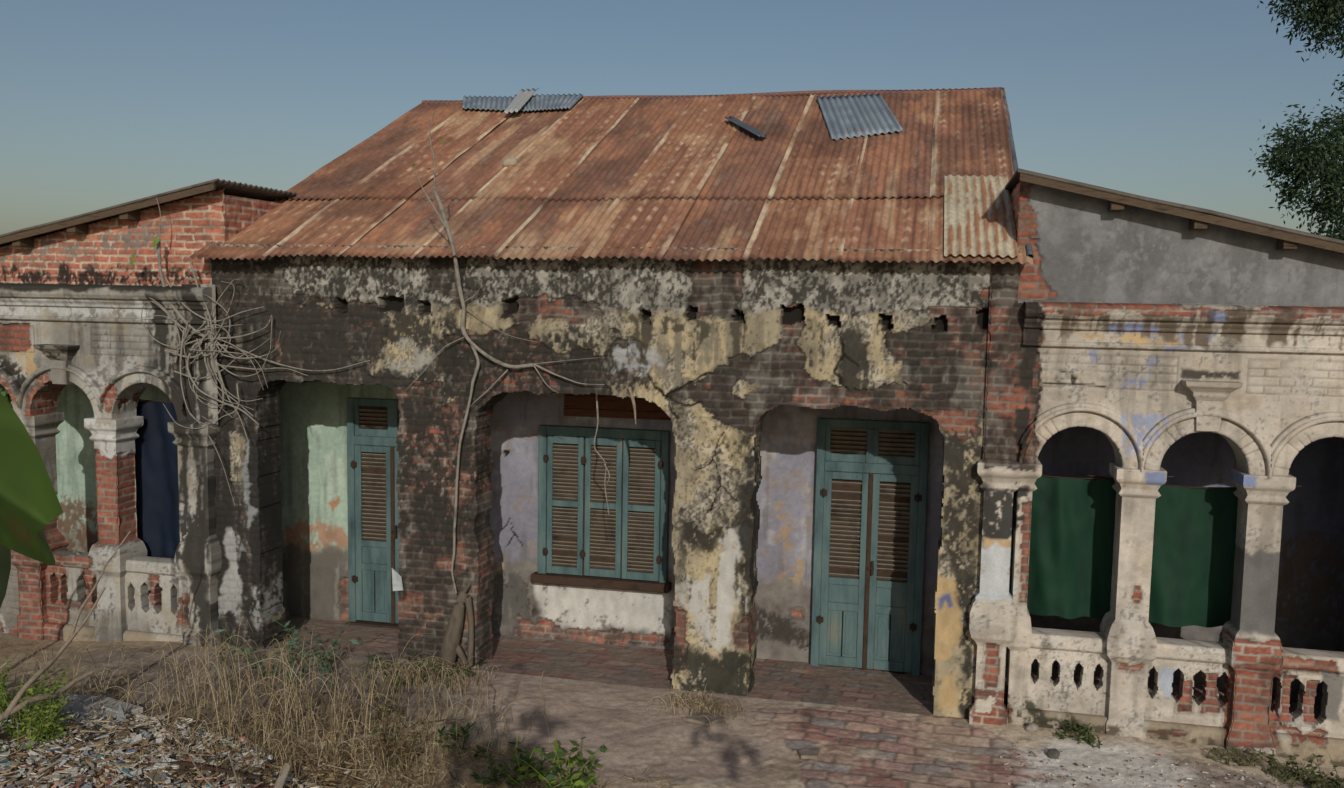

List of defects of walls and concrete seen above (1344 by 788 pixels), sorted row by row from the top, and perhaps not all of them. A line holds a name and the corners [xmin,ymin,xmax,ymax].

flaking render [211,255,634,669]
water stain [0,244,991,647]
flaking render [671,181,1210,471]
water stain [1038,202,1344,352]
water stain [1177,366,1243,385]
flaking render [0,449,142,641]
water stain [490,416,811,696]
flaking render [733,604,756,650]
flaking render [933,574,1013,726]
flaking render [983,502,1032,604]
flaking render [1148,628,1340,750]